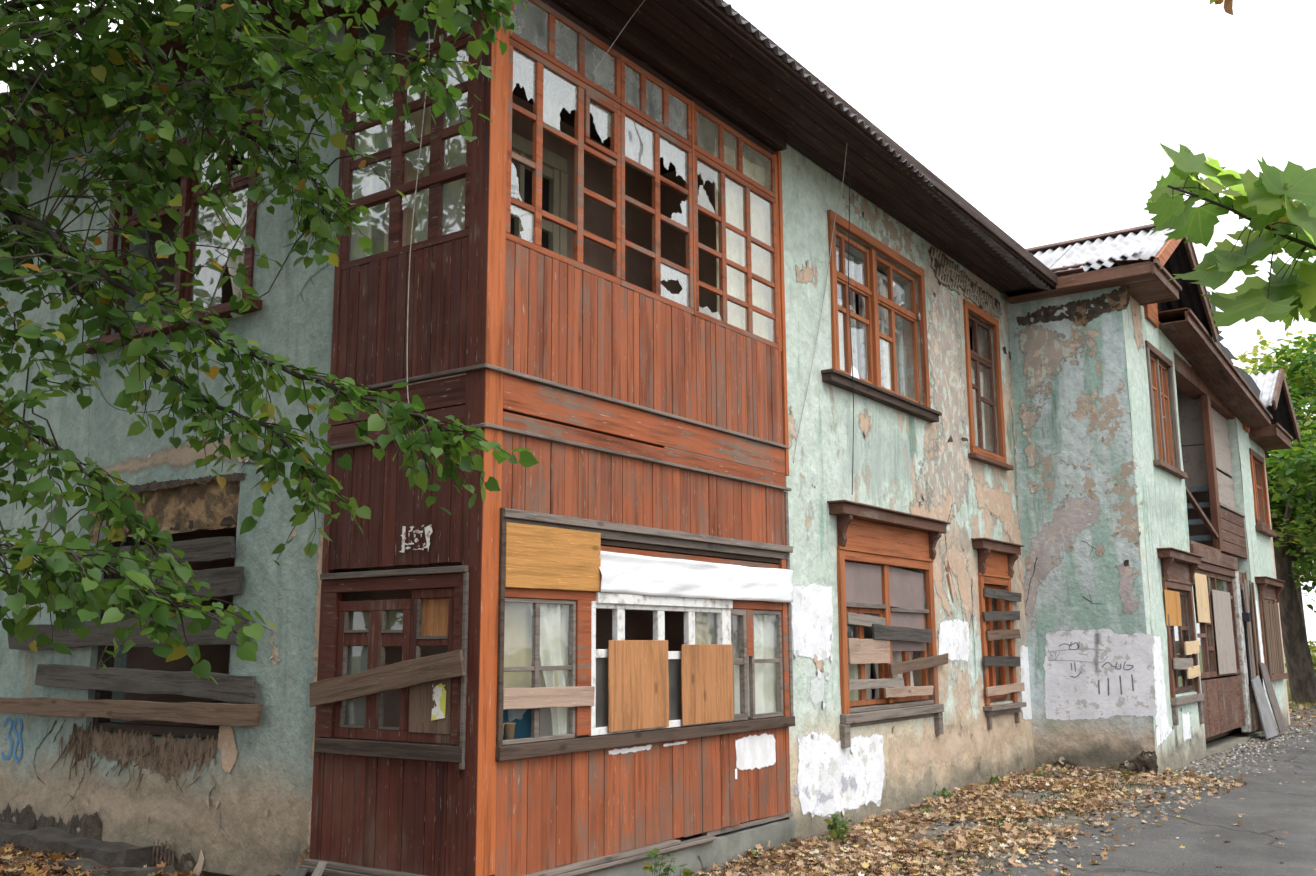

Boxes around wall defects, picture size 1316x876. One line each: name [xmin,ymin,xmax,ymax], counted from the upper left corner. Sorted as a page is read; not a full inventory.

peeling [102,418,280,477]
peeling [842,193,1144,631]